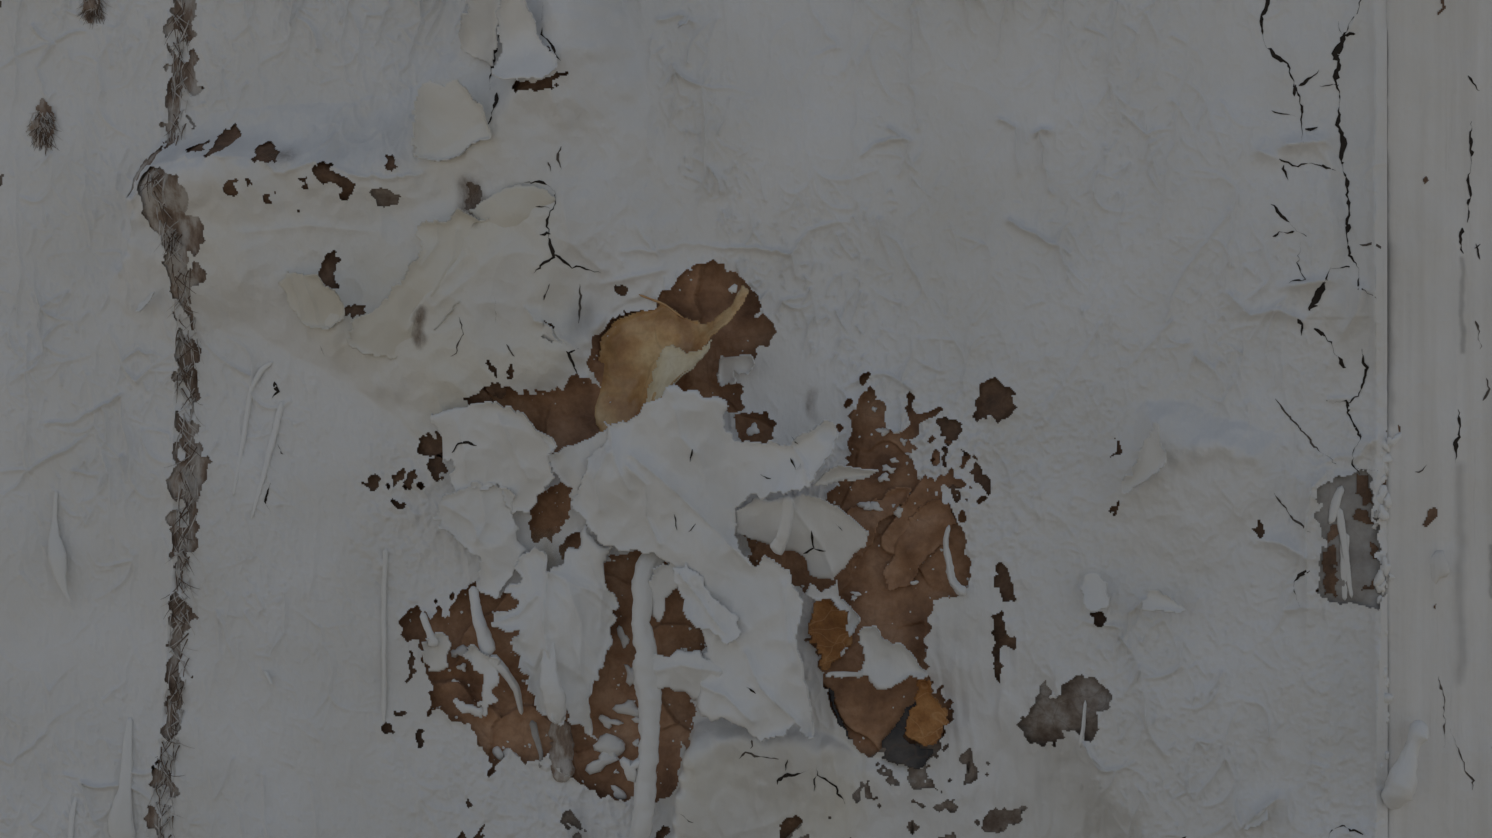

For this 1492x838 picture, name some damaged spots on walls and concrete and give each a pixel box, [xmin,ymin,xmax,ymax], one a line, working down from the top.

peeling [457,0,568,93]
peeling [187,123,242,158]
peeling [223,141,280,204]
peeling [298,154,401,208]
peeling [318,250,341,289]
crack [525,147,599,375]
crack [1260,0,1381,474]
crack [126,0,212,838]
peeling [361,259,1018,838]
peeling [1314,470,1386,610]
peeling [1016,674,1112,748]
peeling [974,806,1028,833]